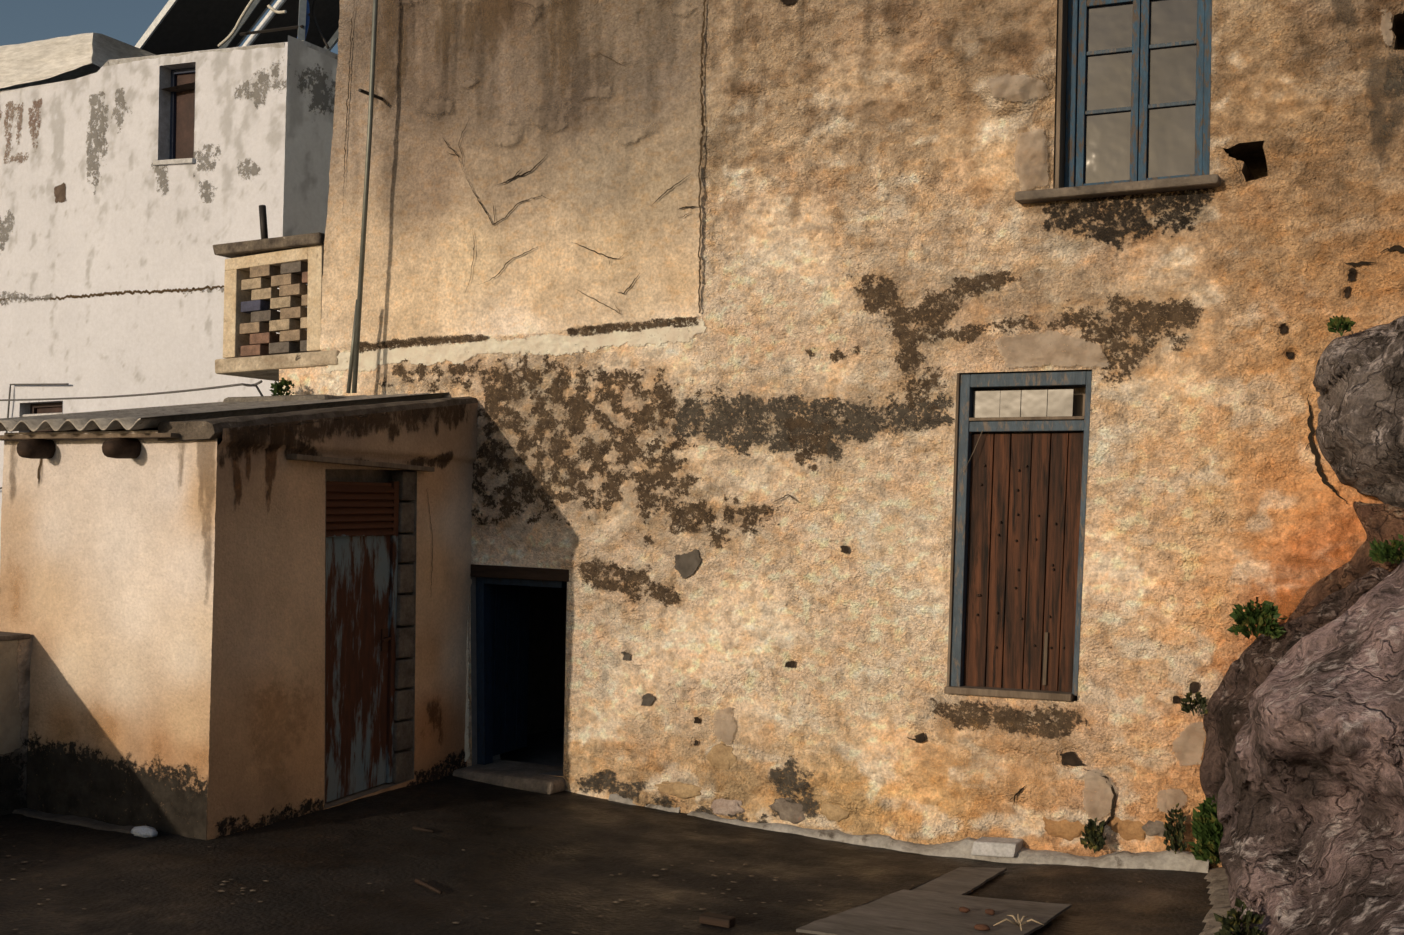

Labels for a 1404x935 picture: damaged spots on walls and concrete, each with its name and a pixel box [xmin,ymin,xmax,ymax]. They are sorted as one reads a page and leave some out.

peeling [234,60,336,114]
peeling [0,98,42,164]
peeling [86,88,128,194]
peeling [193,144,221,203]
crack [442,118,553,289]
leakage [1040,188,1215,256]
crack [0,285,224,301]
crack [576,243,640,314]
leakage [220,269,1204,549]
crack [1306,394,1348,504]
leakage [572,554,680,607]
leakage [0,733,325,840]